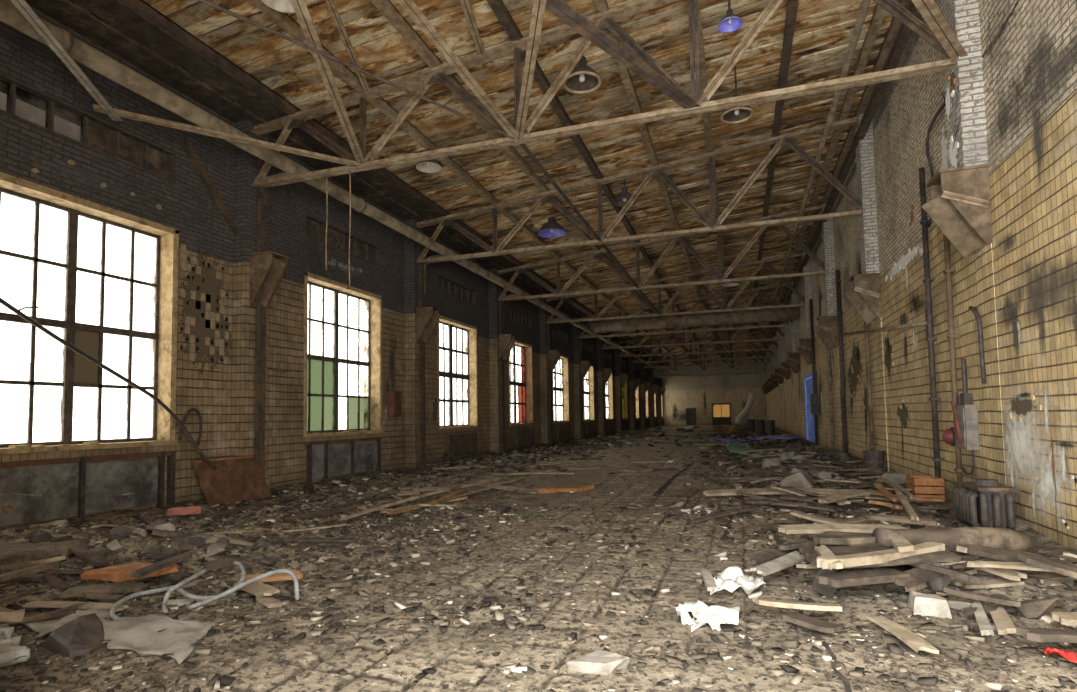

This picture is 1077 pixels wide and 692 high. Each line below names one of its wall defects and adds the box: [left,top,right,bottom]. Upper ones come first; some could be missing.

damp [1033,111,1042,166]
spalling [178,244,232,374]
spalling [1008,392,1042,422]